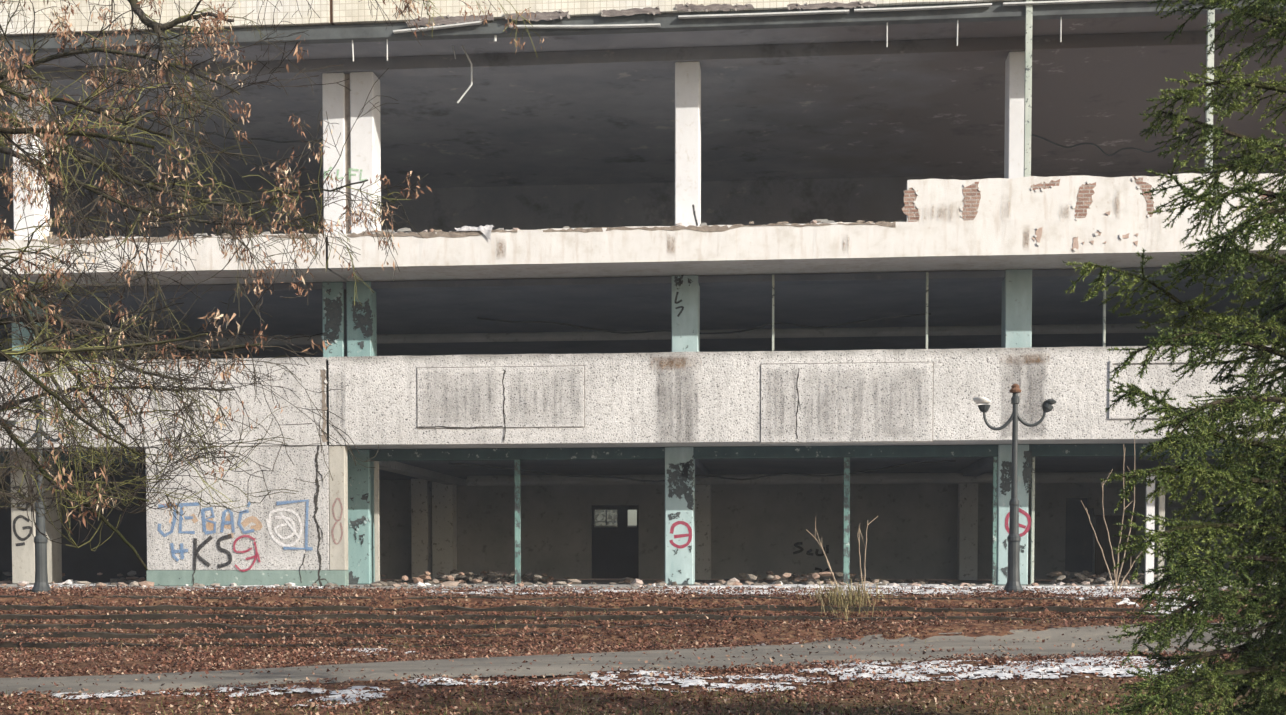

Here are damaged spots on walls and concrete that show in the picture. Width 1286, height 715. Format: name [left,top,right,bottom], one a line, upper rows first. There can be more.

spalling [960,182,982,221]
peeling [1032,227,1043,246]
spalling [1031,179,1060,192]
spalling [1071,181,1138,251]
spalling [1132,176,1154,217]
peeling [321,289,373,349]
crack [150,418,328,586]
peeling [667,455,695,520]